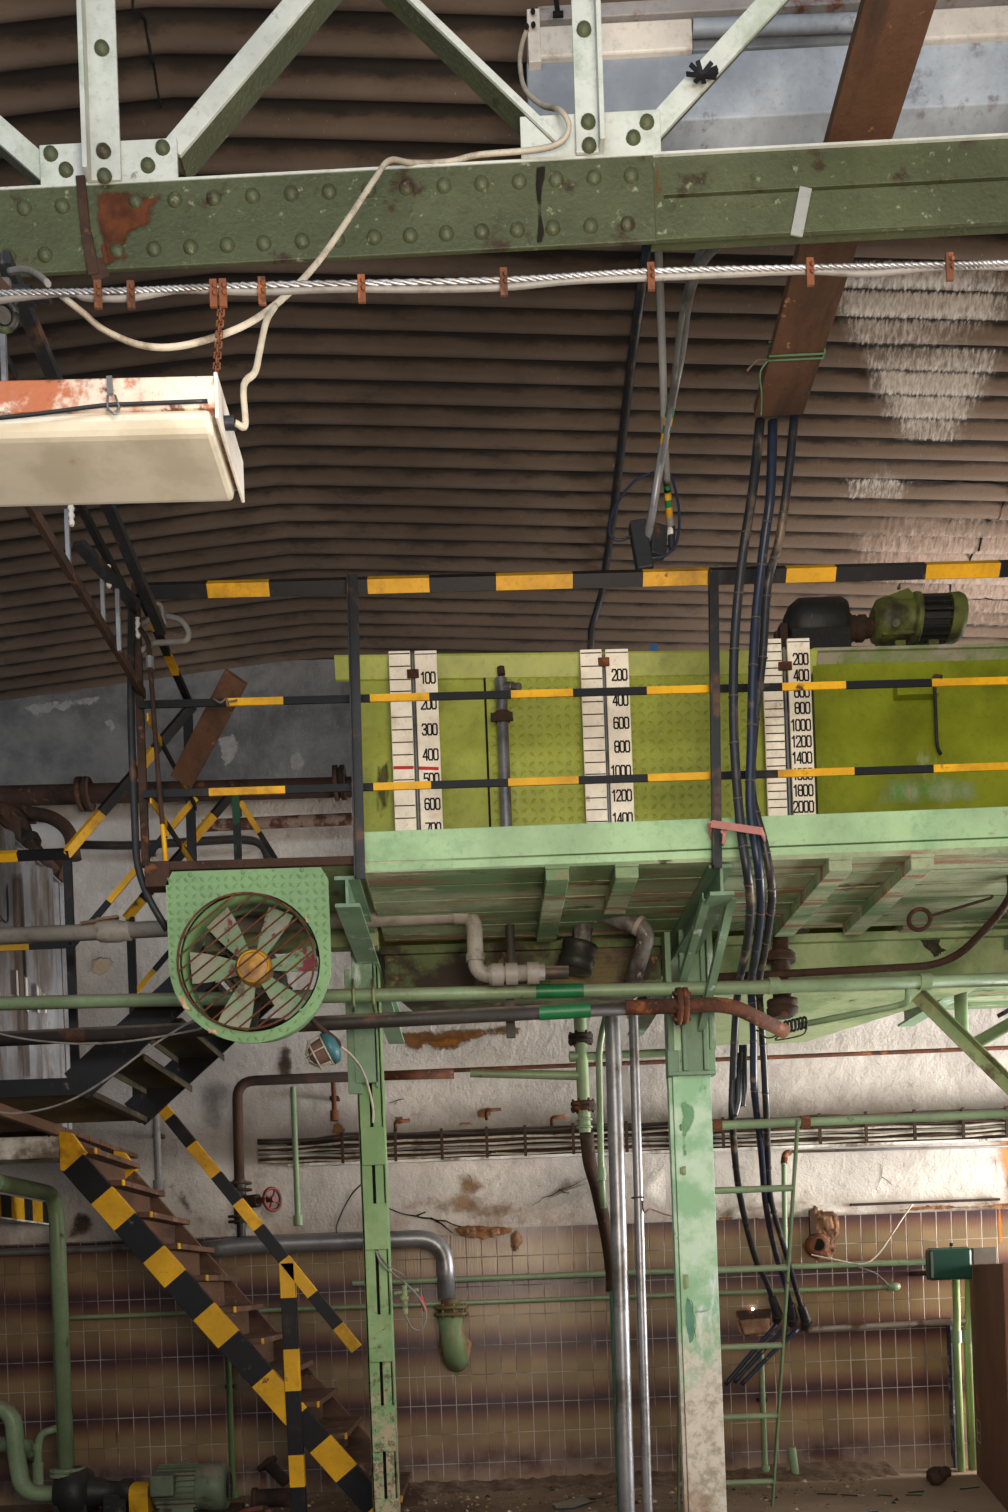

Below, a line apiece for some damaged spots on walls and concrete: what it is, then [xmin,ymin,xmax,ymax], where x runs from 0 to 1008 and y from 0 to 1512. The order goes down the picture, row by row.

rust [97,192,160,265]
efflorescence [839,261,1008,441]
efflorescence [849,479,903,498]
crack [895,479,1008,601]